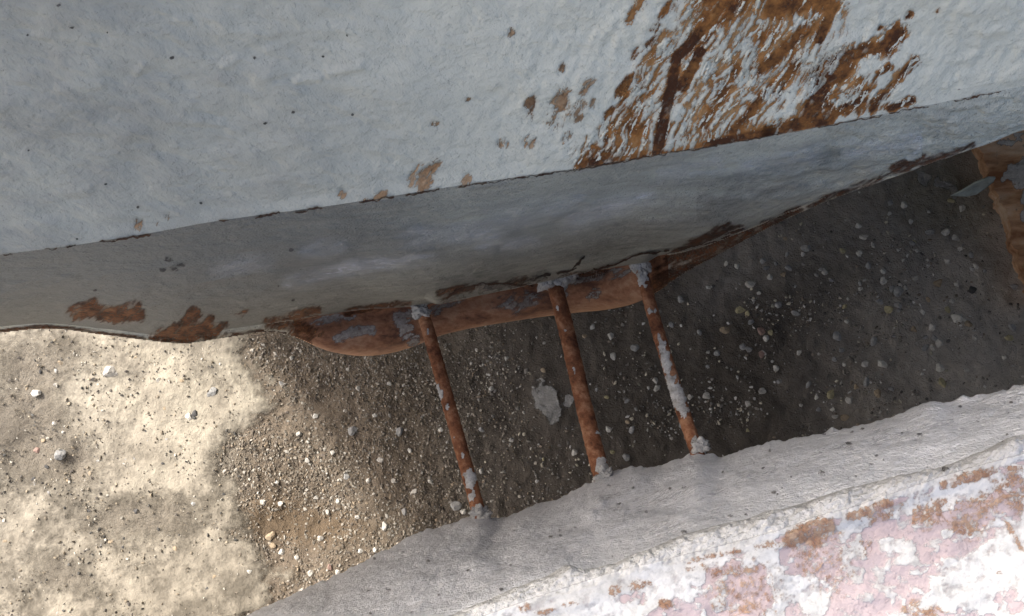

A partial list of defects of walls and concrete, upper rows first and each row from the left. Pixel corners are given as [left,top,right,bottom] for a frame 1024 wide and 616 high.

corrosion [546,0,920,169]
corrosion [524,95,536,120]
corrosion [407,160,443,192]
corrosion [0,298,324,344]
peeling [311,313,377,343]
corrosion [344,300,411,316]
peeling [393,309,429,347]
corrosion [436,284,475,301]
peeling [658,333,690,419]
peeling [448,435,1024,616]